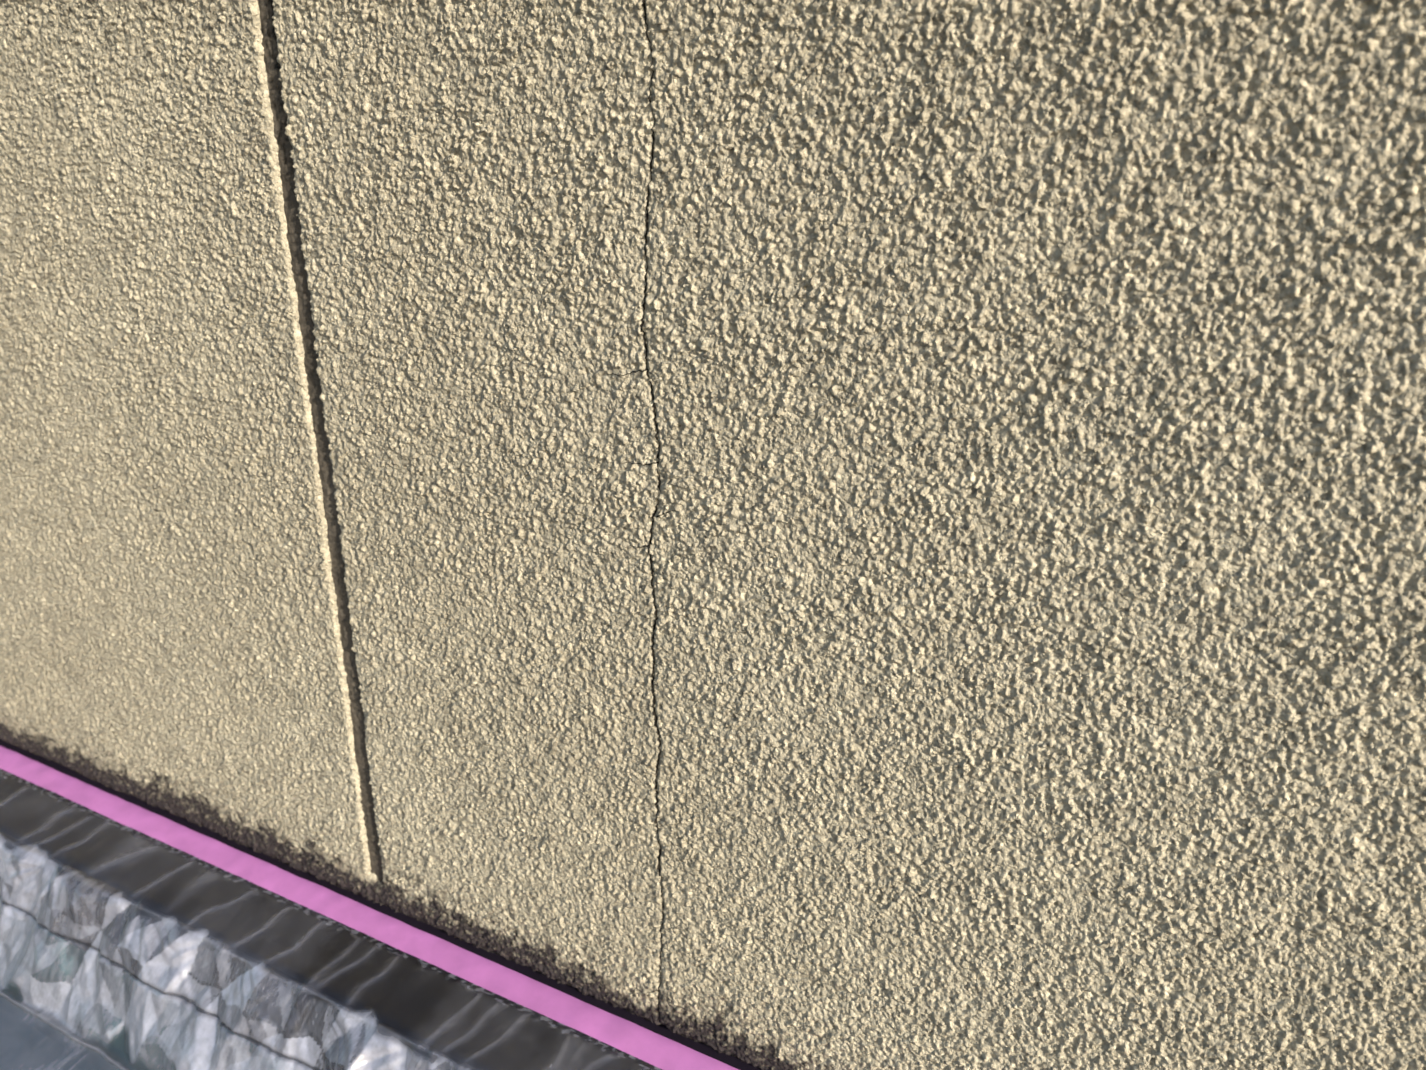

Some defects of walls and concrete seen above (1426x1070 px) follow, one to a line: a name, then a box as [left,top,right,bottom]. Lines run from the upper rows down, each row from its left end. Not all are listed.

leakage [0,714,808,1070]
crack [610,0,675,1016]